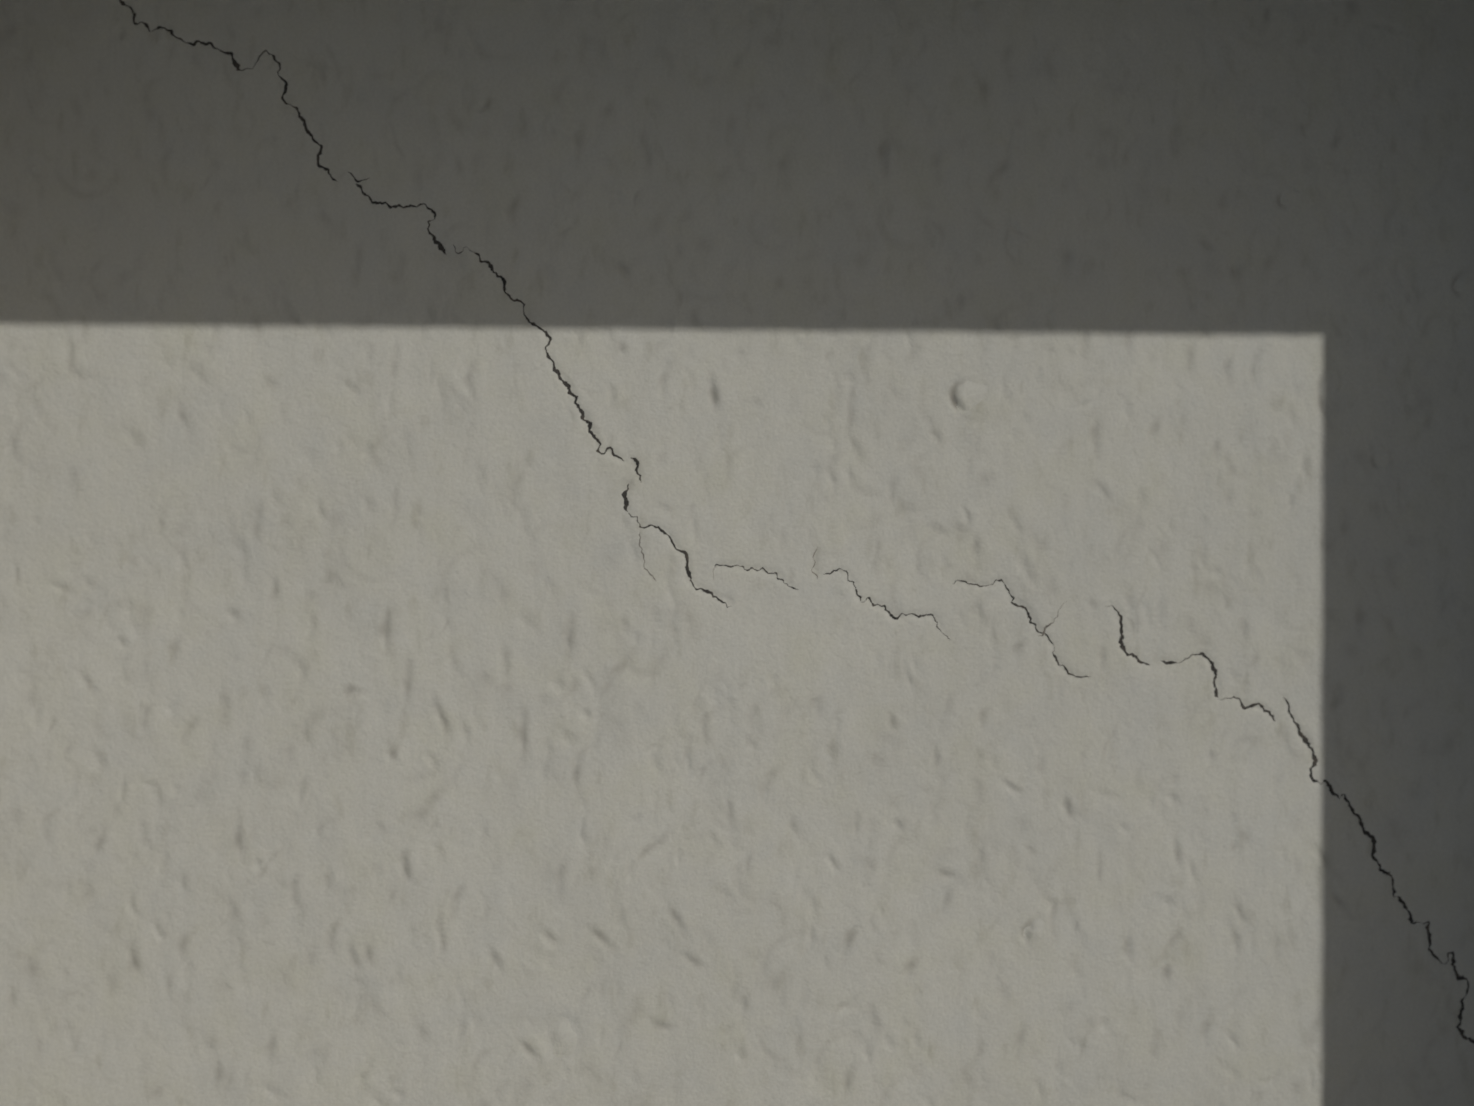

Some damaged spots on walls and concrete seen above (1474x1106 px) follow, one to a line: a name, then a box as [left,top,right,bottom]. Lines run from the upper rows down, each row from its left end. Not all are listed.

crack [119,0,949,639]
crack [954,579,1089,678]
crack [1107,605,1474,1044]